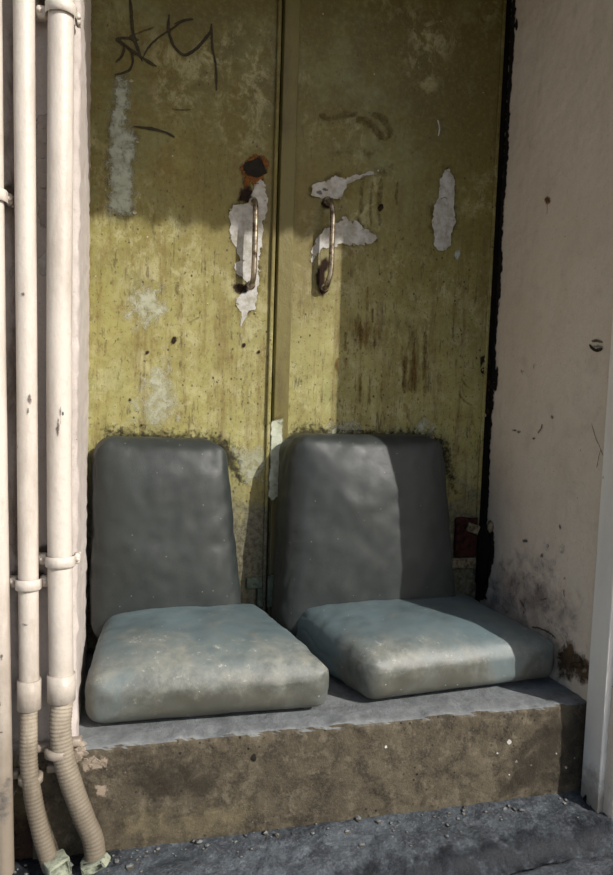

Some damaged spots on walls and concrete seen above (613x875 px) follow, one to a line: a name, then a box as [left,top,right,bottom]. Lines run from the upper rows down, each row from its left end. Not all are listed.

peeling [107,75,139,216]
peeling [228,179,268,326]
rust [238,154,269,203]
peeling [311,216,377,262]
peeling [310,169,379,200]
peeling [431,169,460,260]
damp [479,0,568,639]
damp [12,755,45,875]
damp [69,854,84,868]